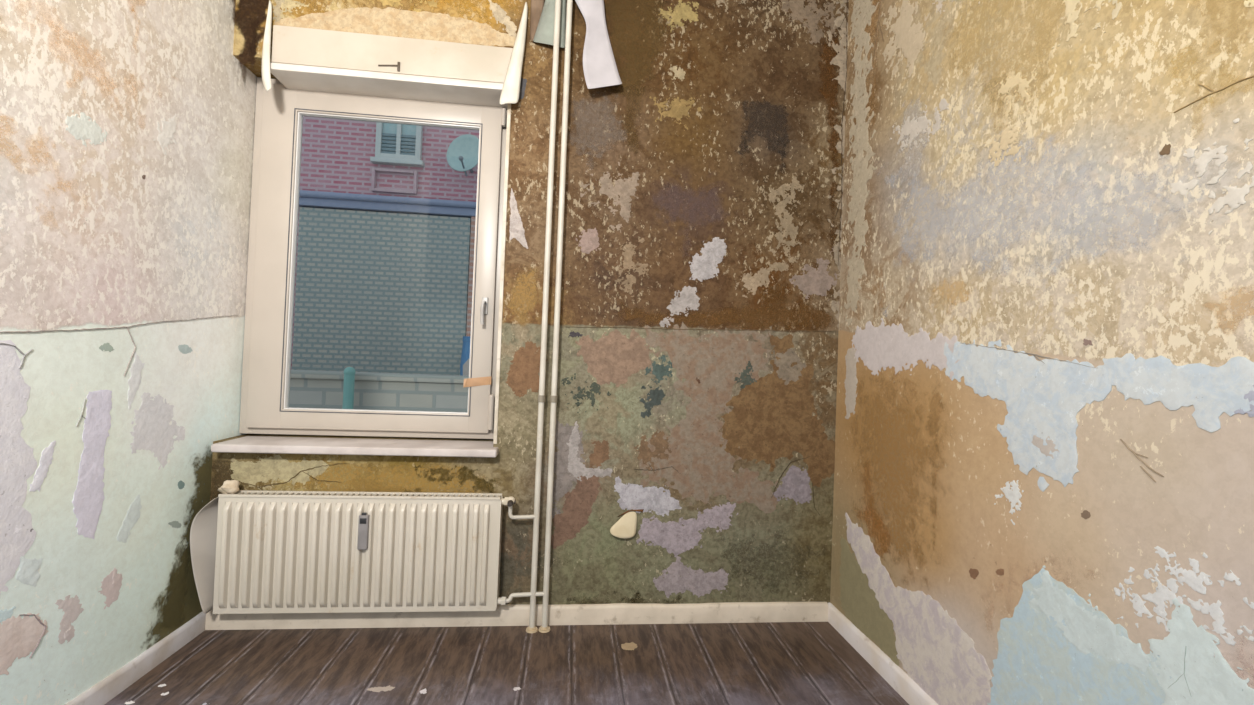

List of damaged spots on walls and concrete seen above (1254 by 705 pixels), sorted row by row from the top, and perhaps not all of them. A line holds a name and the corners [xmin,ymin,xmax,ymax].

leakage [232,0,269,79]
peeling [518,77,527,100]
peeling [658,0,699,32]
peeling [509,188,528,249]
peeling [565,162,653,301]
flaking render [735,0,959,419]
flaking render [500,339,547,398]
flaking render [547,237,835,598]
flaking render [230,455,331,490]
leakage [147,451,234,649]
flaking render [845,513,992,705]
peeling [1154,546,1254,646]